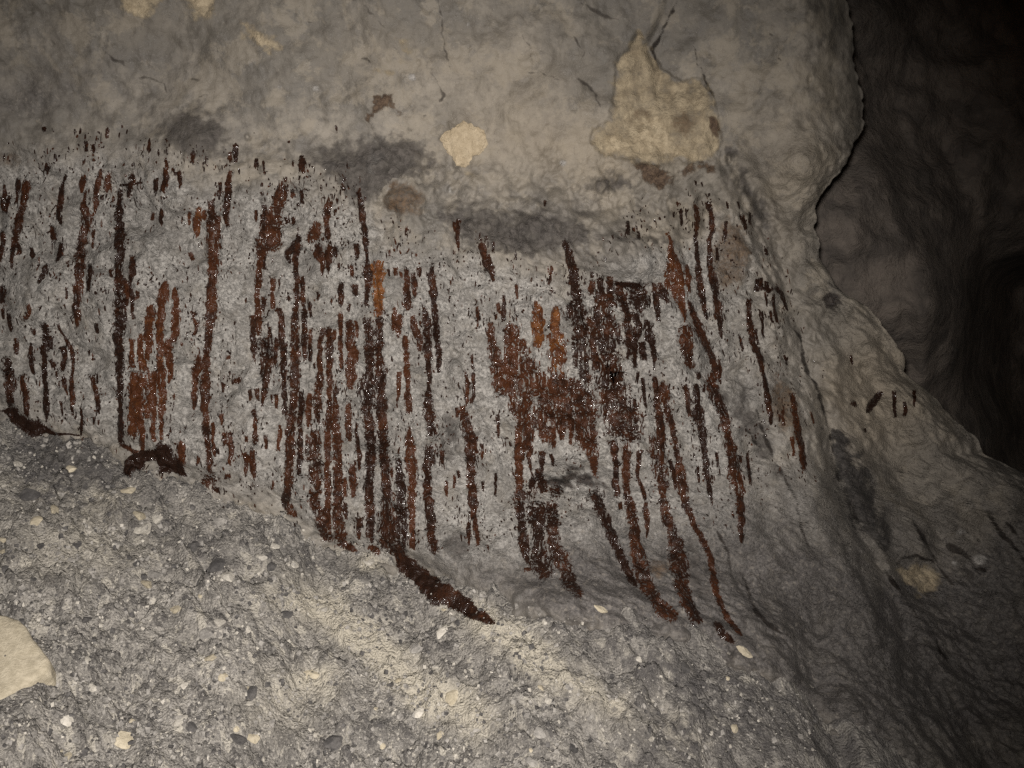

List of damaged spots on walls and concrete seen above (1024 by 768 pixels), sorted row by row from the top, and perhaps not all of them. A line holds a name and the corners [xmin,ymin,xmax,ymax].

spalling [592,33,719,164]
leakage [163,114,225,157]
spalling [440,120,488,168]
leakage [314,137,434,202]
leakage [438,209,589,258]
corrosion [0,125,825,644]
corrosion [851,390,917,418]